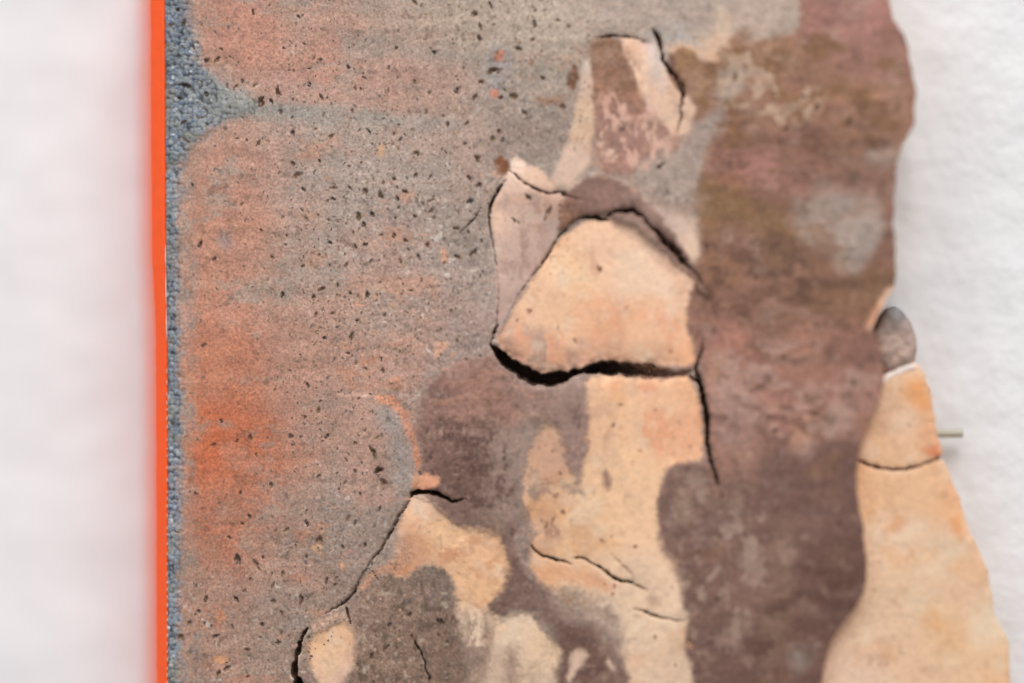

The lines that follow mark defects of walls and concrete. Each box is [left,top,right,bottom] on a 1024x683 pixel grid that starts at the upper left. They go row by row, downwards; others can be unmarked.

crack [602,30,686,126]
spalling [686,5,735,62]
crack [460,174,566,263]
crack [536,207,700,278]
water stain [177,152,342,524]
spalling [353,33,707,683]
water stain [234,0,917,683]
crack [490,307,719,485]
crack [860,457,940,471]
crack [378,489,460,552]
crack [532,545,684,622]
crack [291,628,308,683]